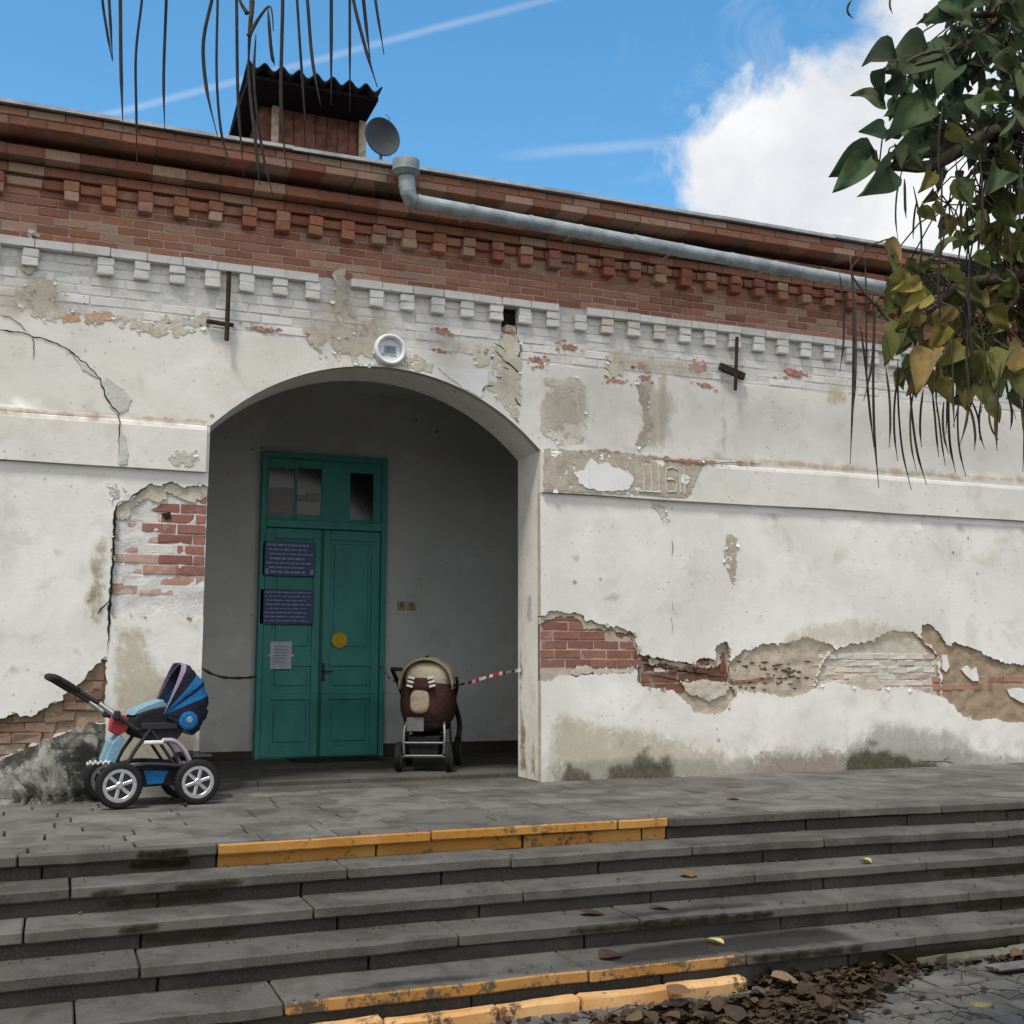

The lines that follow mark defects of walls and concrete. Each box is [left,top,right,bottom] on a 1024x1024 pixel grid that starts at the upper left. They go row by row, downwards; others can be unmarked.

crack [0,315,121,461]
flaking render [12,251,210,338]
flaking render [303,319,379,368]
flaking render [472,309,705,523]
crack [98,485,149,651]
flaking render [106,482,208,622]
flaking render [0,657,107,760]
mould [562,764,591,781]
mould [608,752,673,779]
flaking render [537,611,1024,723]
water stain [754,731,970,773]